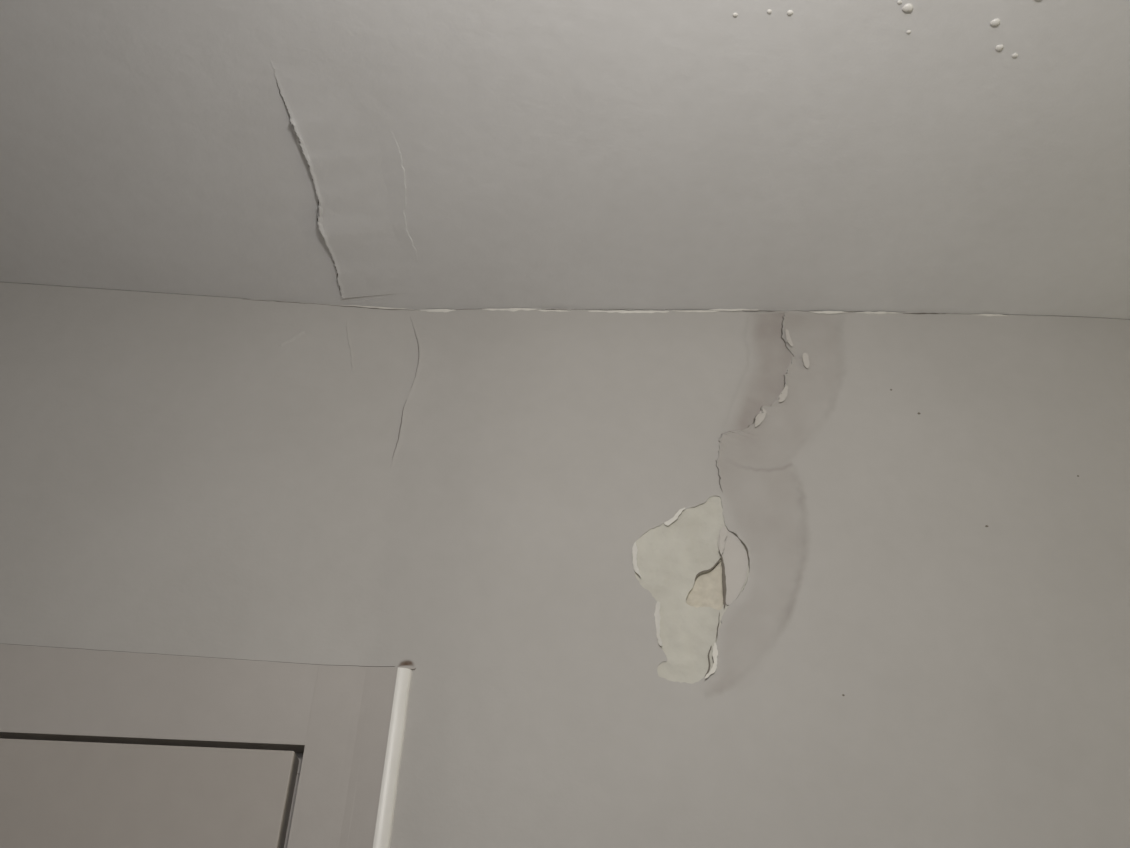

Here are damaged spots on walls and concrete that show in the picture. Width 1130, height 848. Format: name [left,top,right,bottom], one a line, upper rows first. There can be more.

crack [7,60,758,313]
crack [795,309,1008,317]
spalling [632,496,749,684]